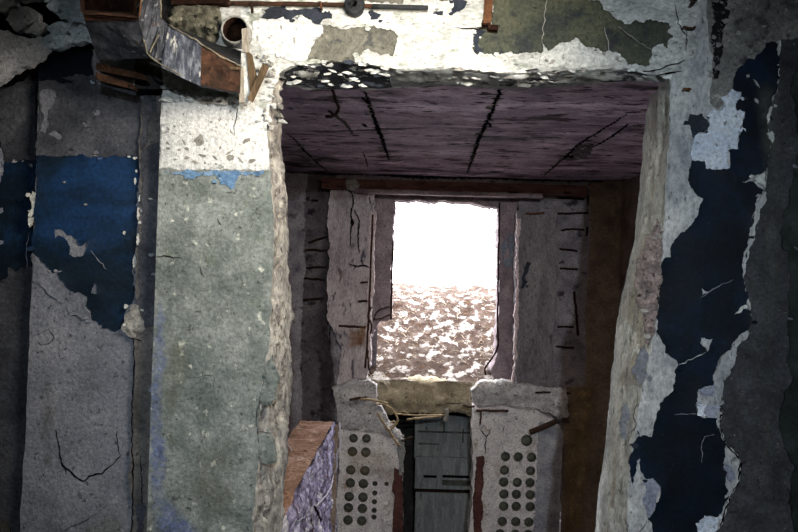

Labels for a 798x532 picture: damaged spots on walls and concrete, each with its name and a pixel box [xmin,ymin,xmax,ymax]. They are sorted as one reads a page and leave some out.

spalling [252,0,673,134]
spalling [709,0,730,80]
crack [55,338,143,532]
peeling [0,0,264,332]
crack [286,89,638,270]
spalling [463,202,571,425]
spalling [557,291,579,336]
spalling [557,184,590,215]
peeling [618,41,780,532]
peeling [778,154,798,532]